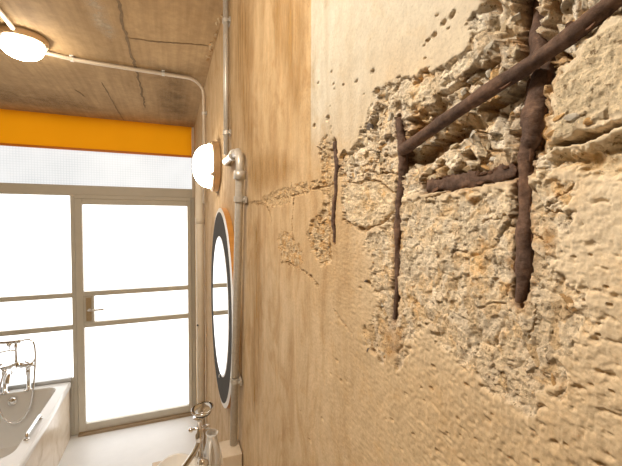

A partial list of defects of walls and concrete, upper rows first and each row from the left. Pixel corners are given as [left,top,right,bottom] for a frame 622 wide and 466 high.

crack [116,0,207,107]
spalling [306,0,622,425]